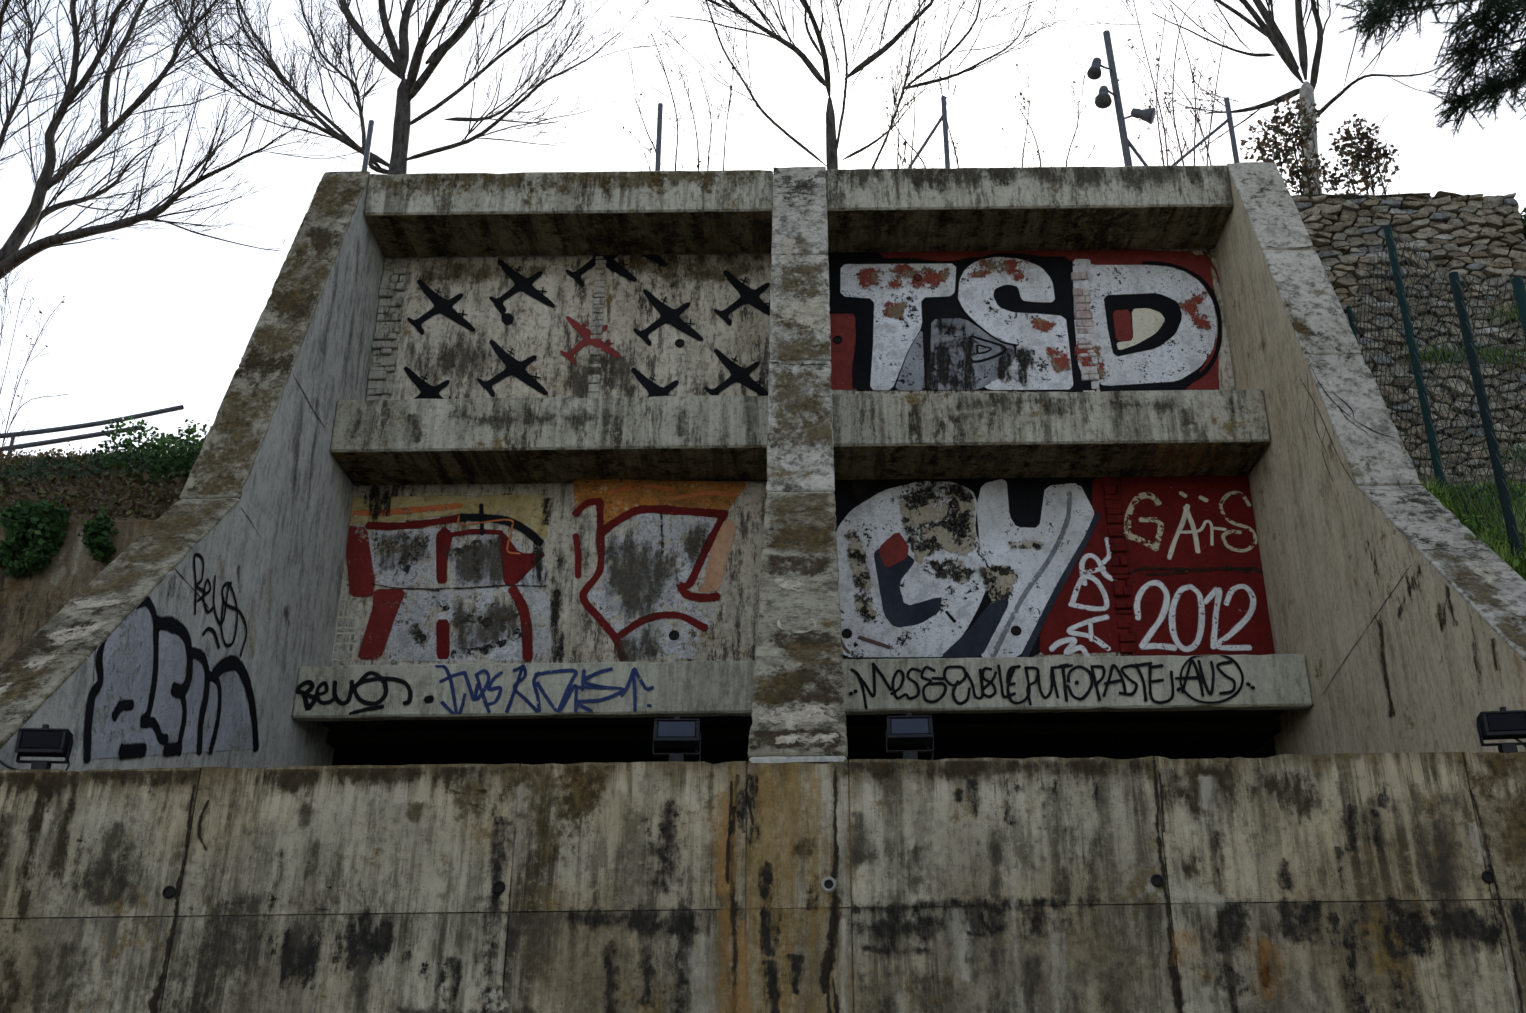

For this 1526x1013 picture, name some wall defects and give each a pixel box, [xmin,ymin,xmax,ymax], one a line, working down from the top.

spalling [851,258,1029,319]
spalling [1031,318,1106,381]
spalling [1178,291,1211,331]
spalling [844,530,878,625]
spalling [898,482,1044,605]
water stain [0,770,199,1013]
crack [148,784,209,1013]
water stain [157,816,535,1013]
water stain [567,905,705,1013]
water stain [840,758,1322,1013]
crack [1153,760,1185,1013]
water stain [1277,782,1526,1013]